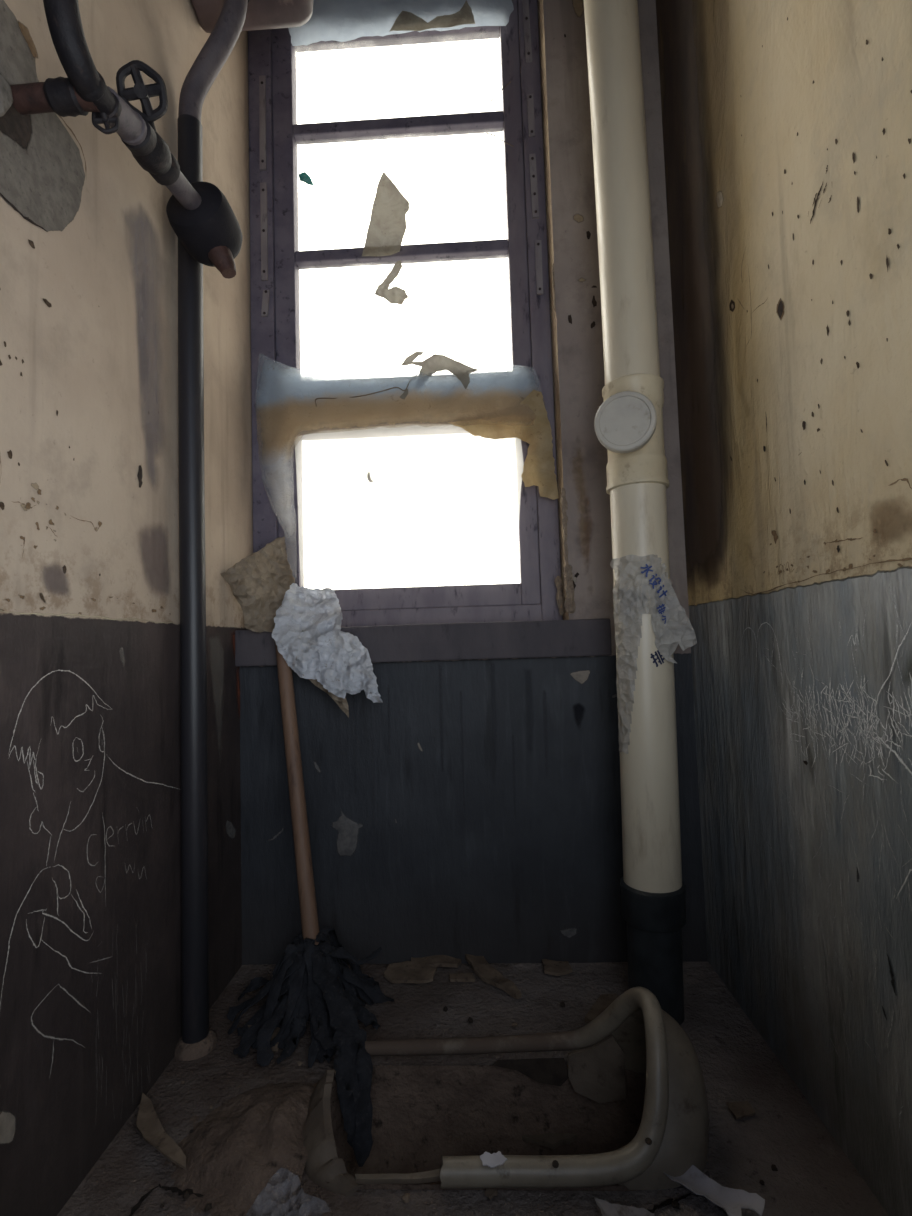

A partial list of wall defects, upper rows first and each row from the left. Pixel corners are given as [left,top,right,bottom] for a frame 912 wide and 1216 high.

water stain [873,504,912,539]
crack [129,1184,204,1216]
crack [647,1192,691,1213]